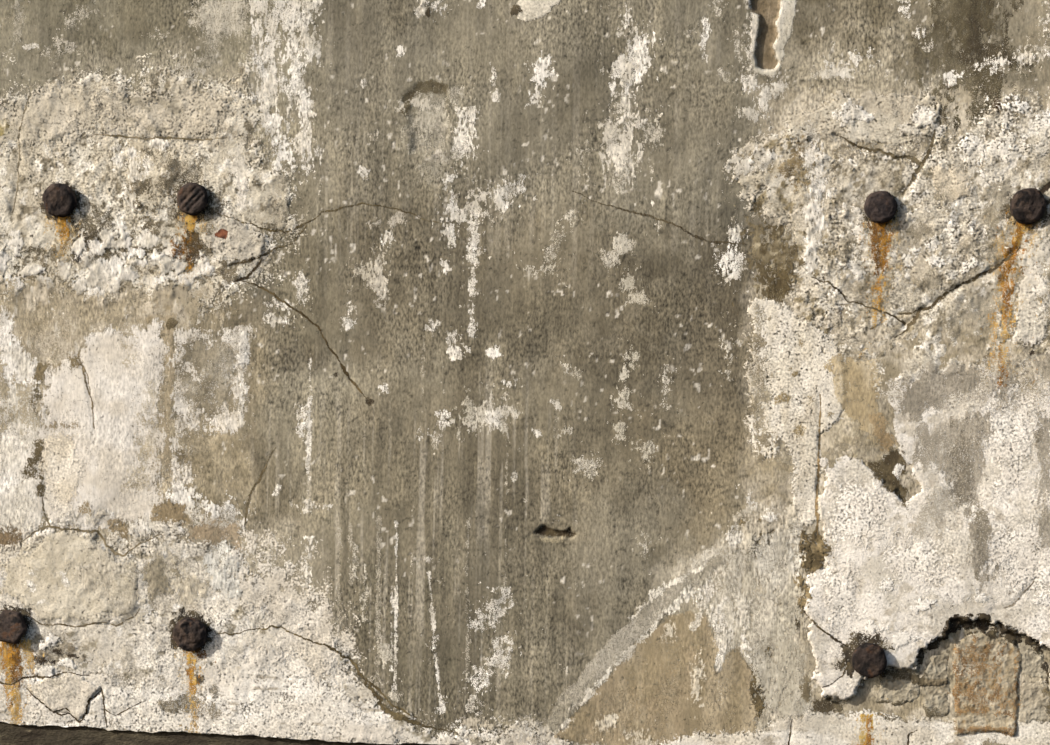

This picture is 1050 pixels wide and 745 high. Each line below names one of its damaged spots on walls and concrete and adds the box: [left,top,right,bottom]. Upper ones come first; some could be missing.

peeling [717,0,798,123]
peeling [931,70,964,94]
peeling [970,1,1050,82]
corrosion [169,206,216,283]
crack [215,202,439,404]
corrosion [856,210,907,329]
crack [812,247,1020,338]
corrosion [979,209,1045,397]
peeling [963,477,1050,607]
corrosion [0,634,44,725]
crack [0,672,141,727]
crack [207,625,453,732]